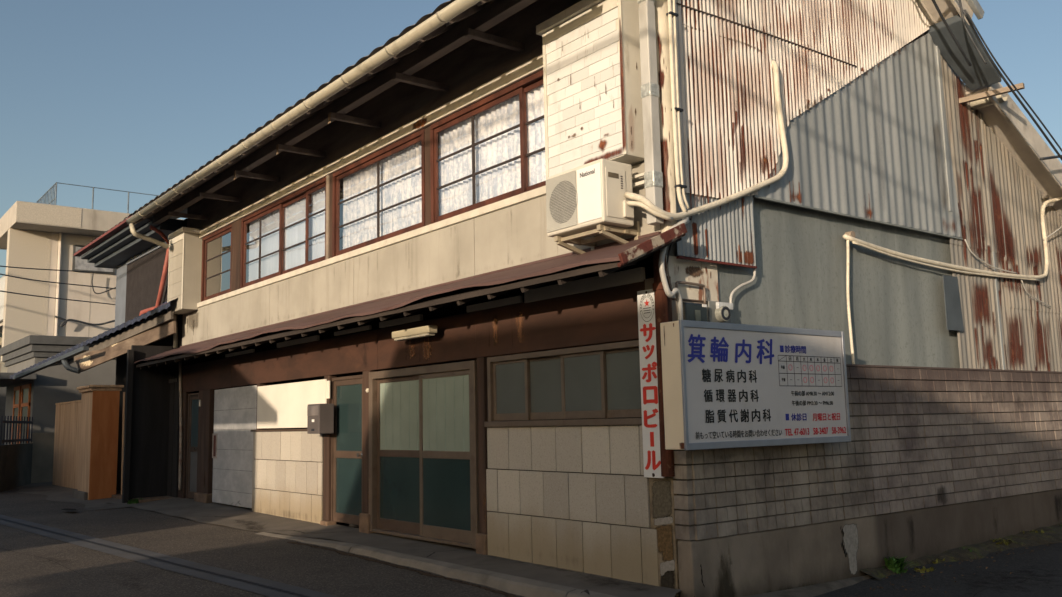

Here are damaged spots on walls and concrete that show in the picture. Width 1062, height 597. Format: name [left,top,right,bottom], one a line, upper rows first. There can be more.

rust [657,35,670,223]
rust [681,0,915,257]
rust [952,77,1062,371]